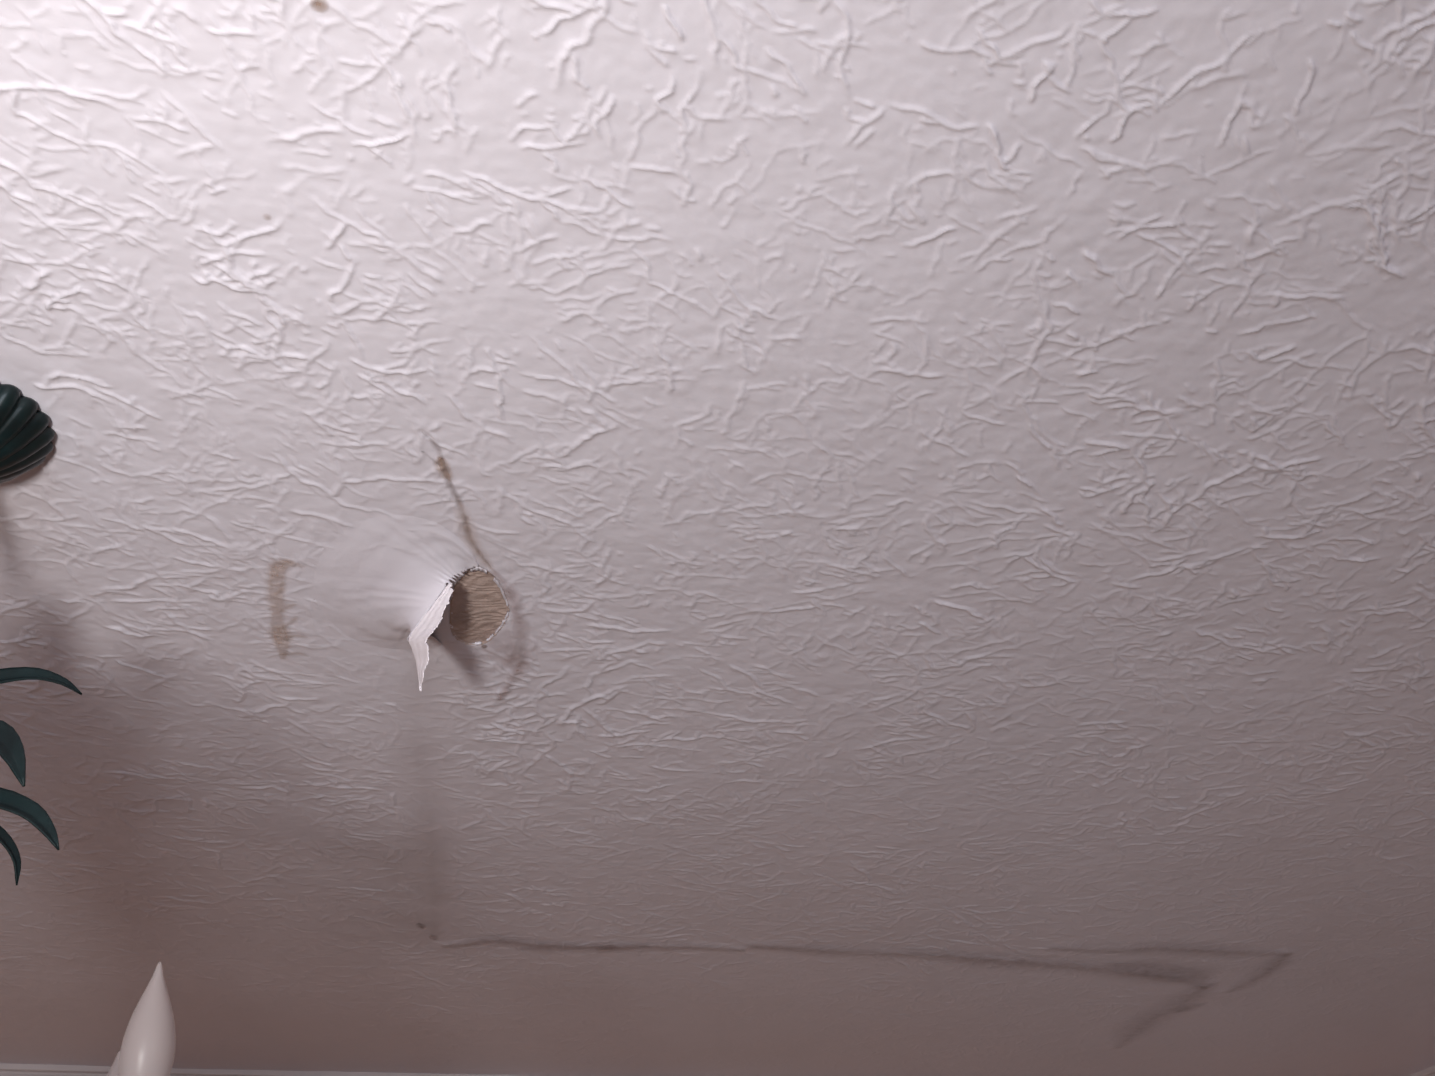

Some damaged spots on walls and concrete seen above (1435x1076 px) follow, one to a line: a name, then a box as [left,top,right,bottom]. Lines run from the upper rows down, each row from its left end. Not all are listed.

crack [438,457,449,479]